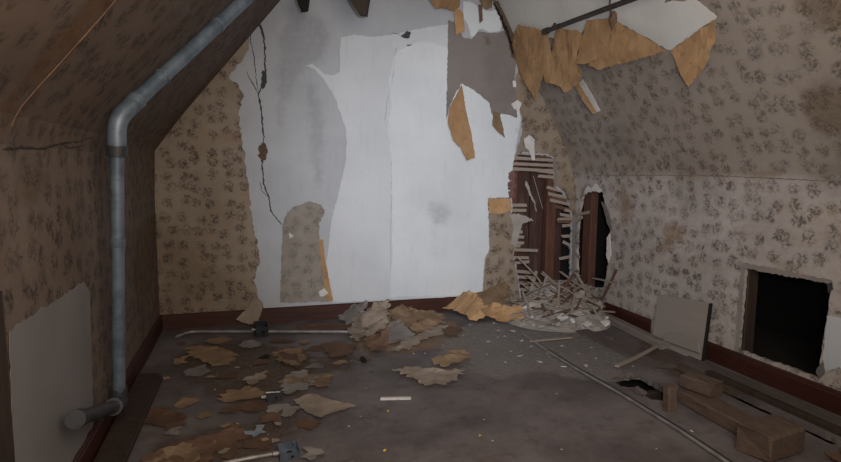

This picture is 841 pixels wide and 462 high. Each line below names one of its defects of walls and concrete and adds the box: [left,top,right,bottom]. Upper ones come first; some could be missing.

peeling [319,239,333,301]